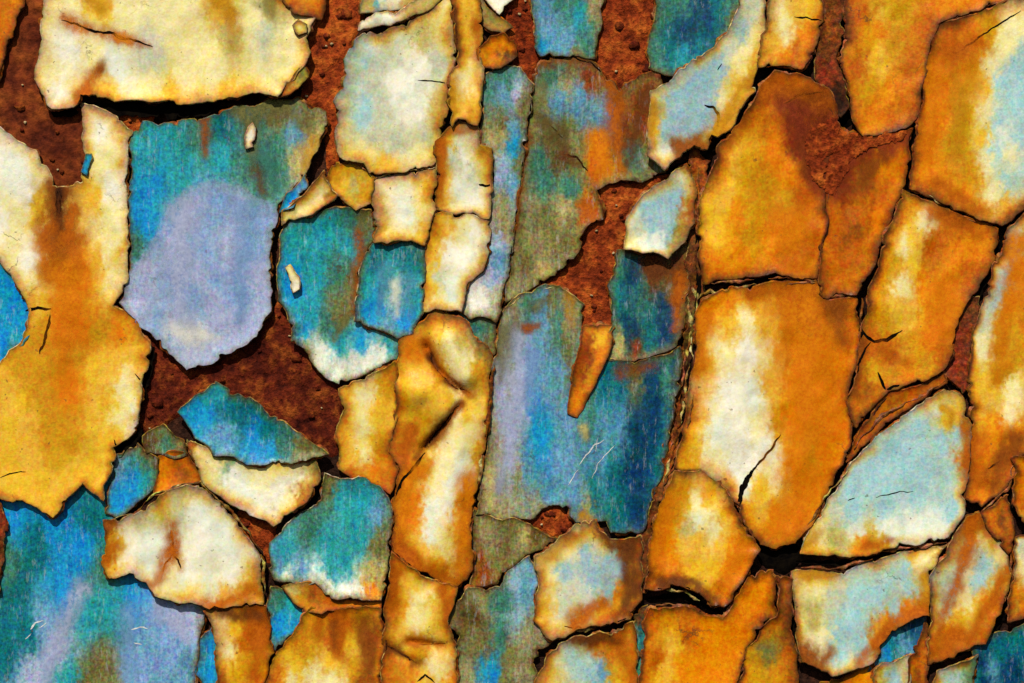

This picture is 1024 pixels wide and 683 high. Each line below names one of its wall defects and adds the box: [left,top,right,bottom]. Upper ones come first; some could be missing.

corrosion [0,0,104,359]
crack [63,20,153,47]
corrosion [301,0,365,172]
corrosion [547,0,670,325]
corrosion [802,62,941,199]
crack [966,11,1020,46]
corrosion [138,302,344,457]
peeling [0,0,496,683]
peeling [354,0,1024,683]
crack [667,224,818,483]
crack [847,327,902,399]
crack [642,434,781,612]